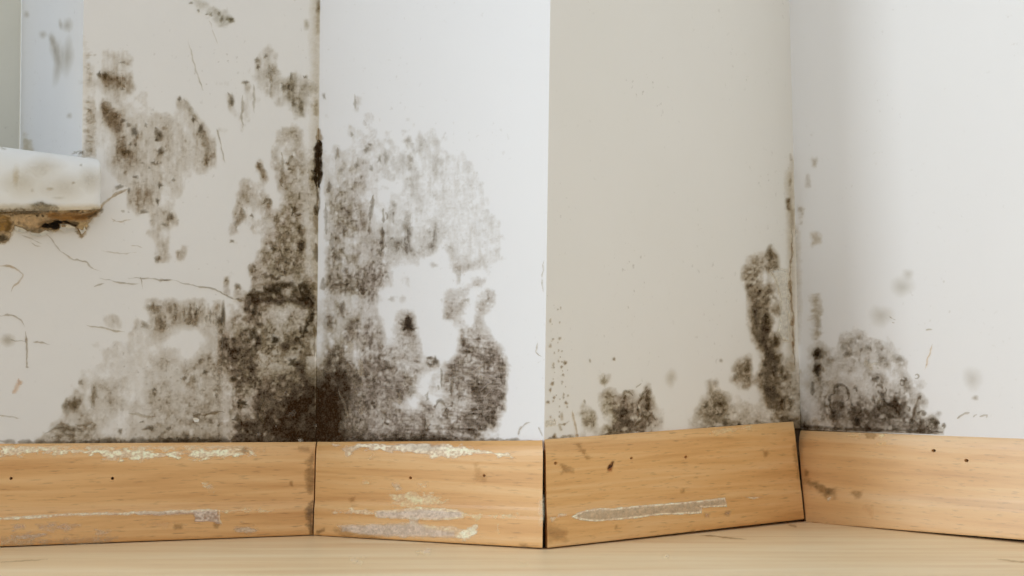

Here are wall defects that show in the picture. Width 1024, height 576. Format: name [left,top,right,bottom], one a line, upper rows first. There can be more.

leakage [102,105,138,173]
leakage [310,130,323,215]
leakage [0,202,58,214]
flaking render [0,206,103,243]
leakage [148,166,506,443]
leakage [737,251,938,434]
leakage [56,397,135,443]
leakage [605,391,656,435]
leakage [699,394,740,426]